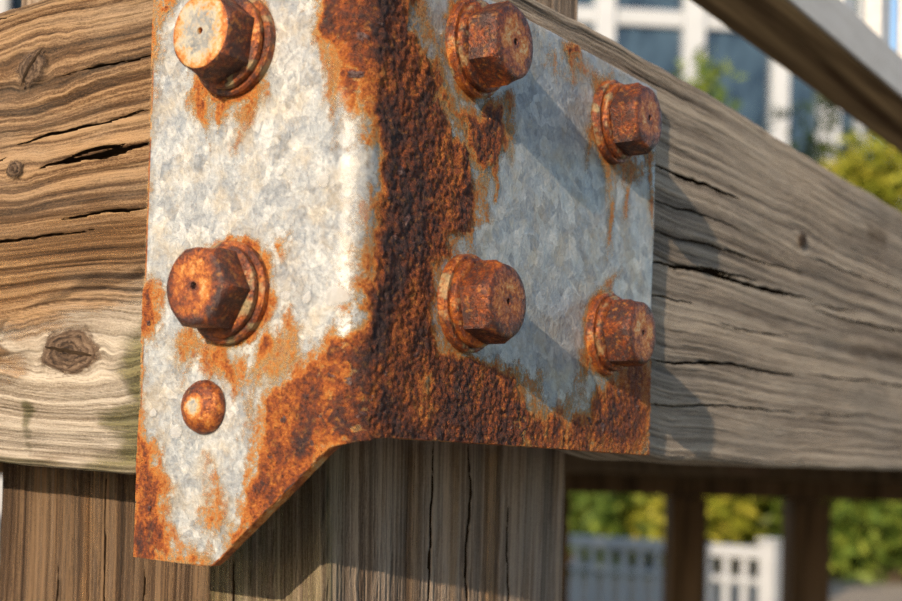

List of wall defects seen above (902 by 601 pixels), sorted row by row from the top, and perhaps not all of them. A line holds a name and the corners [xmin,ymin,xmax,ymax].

crack [0,108,150,169]
crack [655,165,739,199]
corrosion [133,0,655,565]
crack [719,323,788,336]
crack [655,404,863,417]
crack [651,200,902,333]
crack [652,359,902,387]
crack [426,444,434,601]
crack [464,448,472,601]
crack [503,506,511,601]